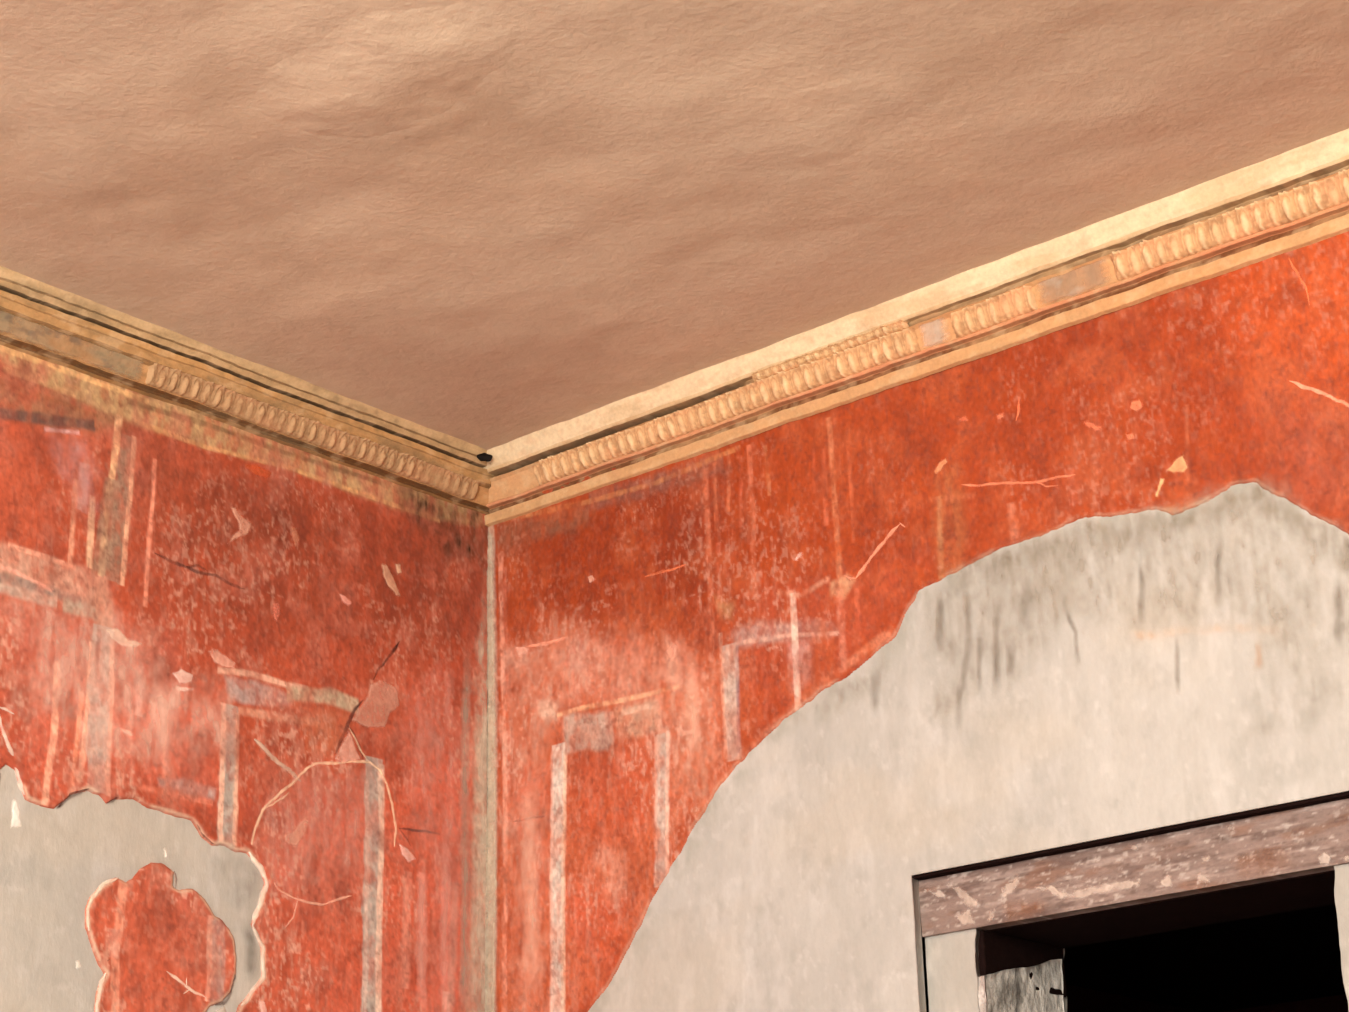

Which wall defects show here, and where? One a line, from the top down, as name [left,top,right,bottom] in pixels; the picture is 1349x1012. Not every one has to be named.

crack [0,717,25,795]
crack [254,641,430,847]
flaking render [588,479,1349,1012]
flaking render [0,765,268,1012]
crack [283,892,350,907]